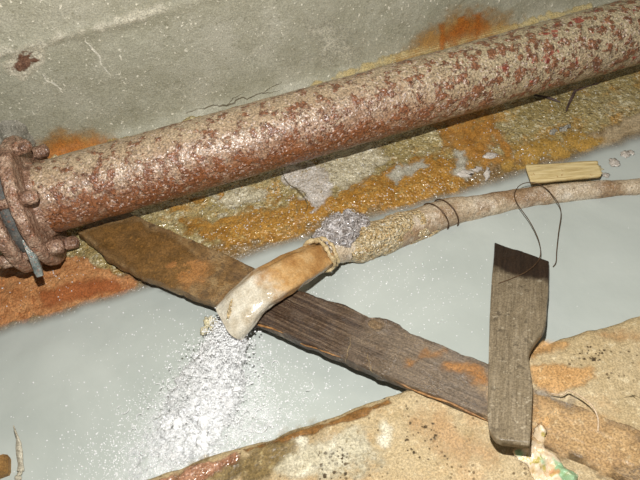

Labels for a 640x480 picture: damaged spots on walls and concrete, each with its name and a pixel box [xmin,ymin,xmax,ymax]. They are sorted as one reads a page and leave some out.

damp [306,3,592,79]
corrosion [416,15,504,52]
spalling [3,48,45,80]
crack [190,83,281,112]
corrosion [40,130,102,160]
damp [281,162,333,211]
damp [387,159,428,185]
damp [453,151,467,180]
corrosion [0,256,137,327]